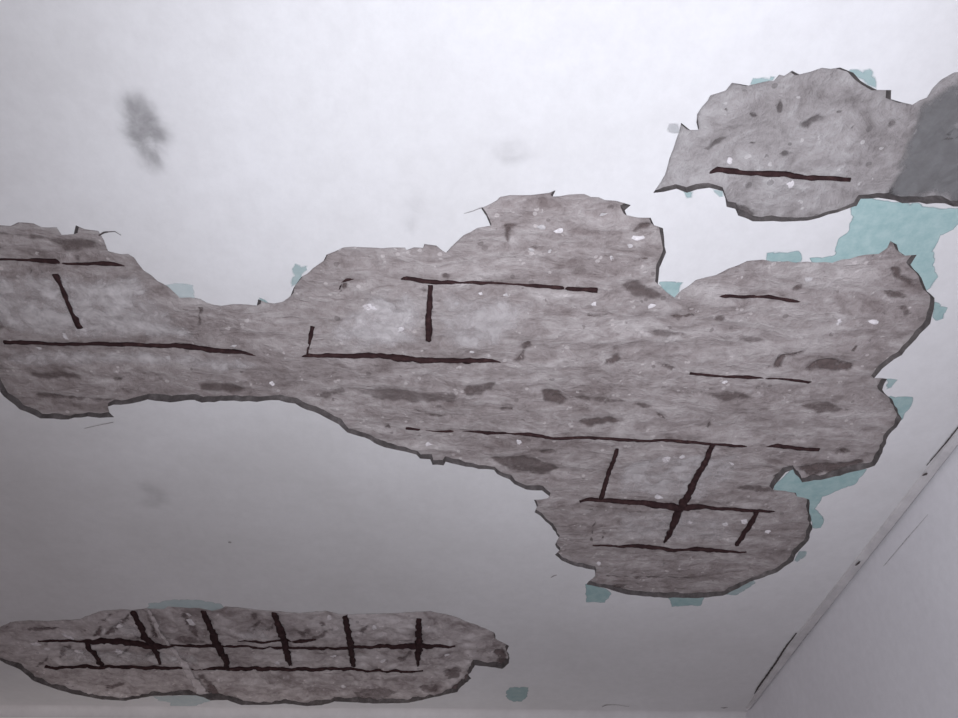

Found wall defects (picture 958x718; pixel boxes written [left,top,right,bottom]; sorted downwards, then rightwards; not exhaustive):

spalling [0,68,958,607]
spalling [0,600,509,706]